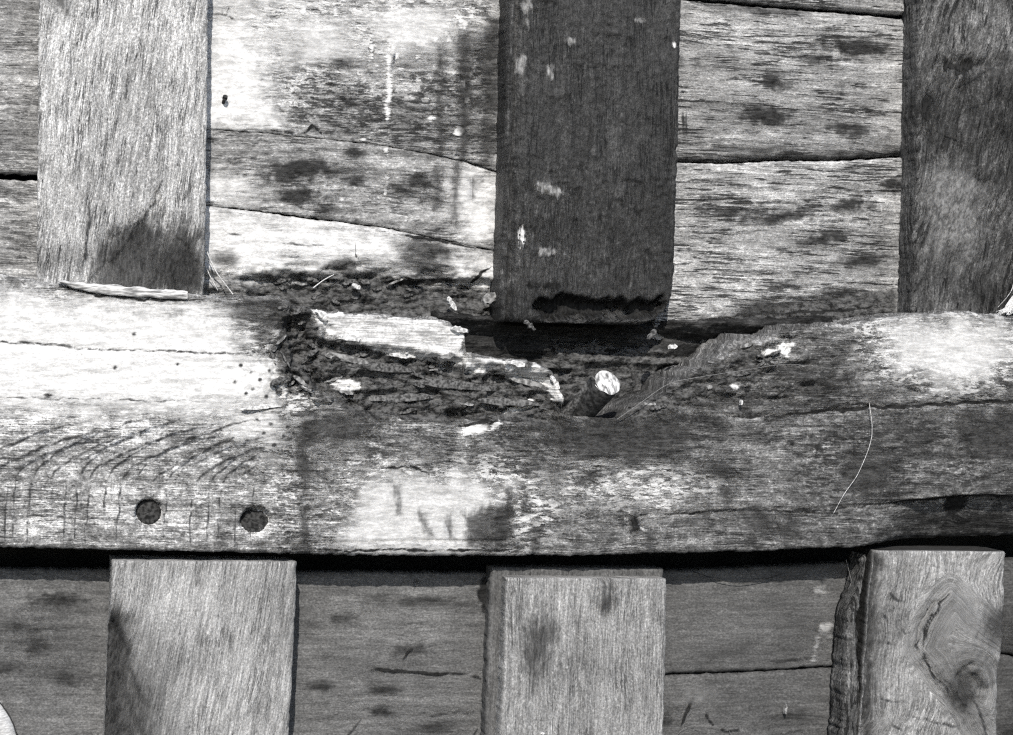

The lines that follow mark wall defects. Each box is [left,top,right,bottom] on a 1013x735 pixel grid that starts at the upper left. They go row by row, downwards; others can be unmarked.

water stain [273,13,499,213]
water stain [254,160,364,213]
water stain [322,257,356,280]
peeling [386,238,470,297]
spalling [269,279,565,431]
spalling [622,342,781,429]
crack [618,494,1013,538]